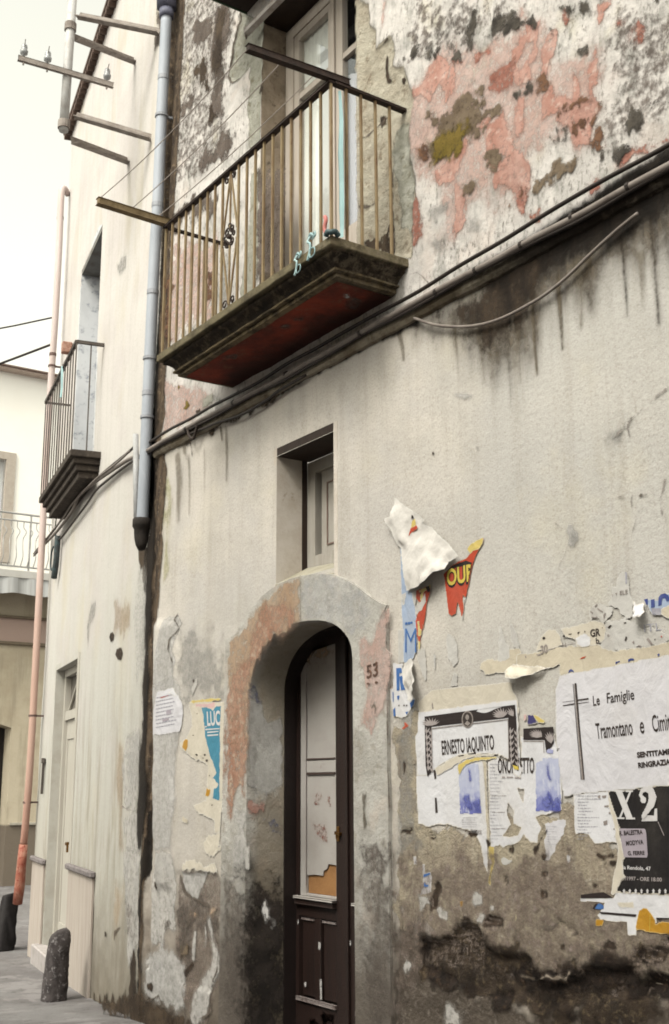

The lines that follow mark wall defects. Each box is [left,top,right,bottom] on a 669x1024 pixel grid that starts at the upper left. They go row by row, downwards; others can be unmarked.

flaking render [228,12,264,148]
flaking render [240,174,258,297]
peeling [355,0,603,259]
water stain [381,188,669,374]
peeling [597,0,611,24]
water stain [544,148,669,229]
peeling [616,21,645,44]
peeling [164,382,220,430]
peeling [223,579,300,870]
flaking render [392,710,669,1019]
flaking render [144,871,221,1024]